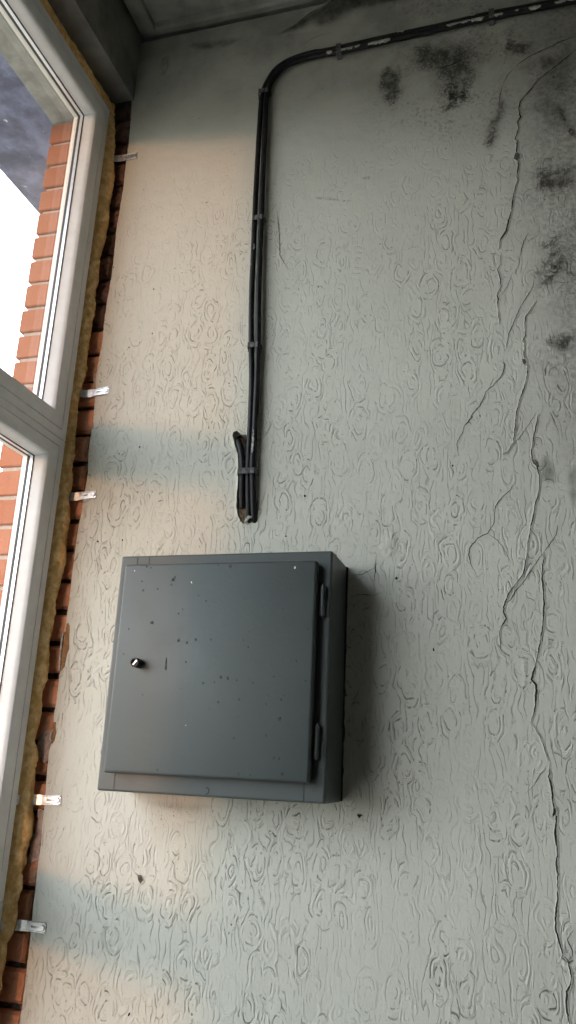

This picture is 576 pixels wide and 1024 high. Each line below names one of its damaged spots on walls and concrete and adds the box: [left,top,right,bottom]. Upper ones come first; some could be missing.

water stain [416,46,473,99]
water stain [538,169,571,189]
crack [457,35,576,1024]